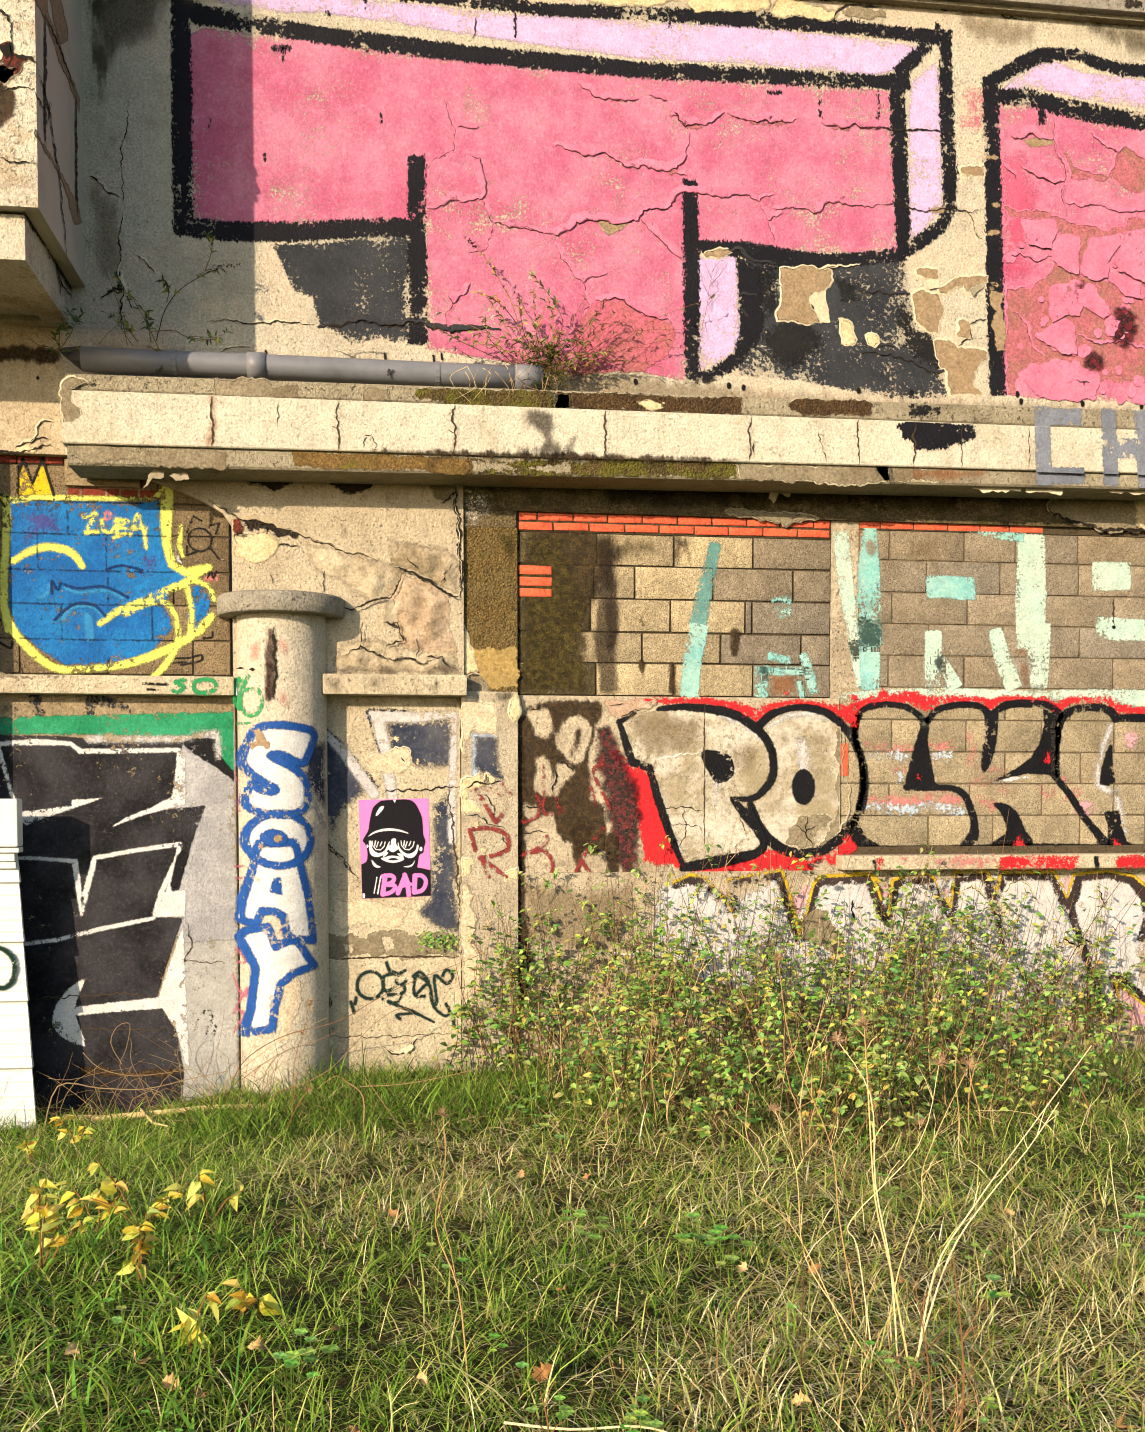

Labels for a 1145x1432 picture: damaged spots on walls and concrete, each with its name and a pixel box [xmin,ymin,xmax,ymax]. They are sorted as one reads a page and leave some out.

peeling [34,0,80,112]
spalling [1124,0,1144,10]
peeling [34,129,83,225]
crack [0,9,156,330]
peeling [414,79,887,417]
peeling [702,118,1145,405]
spalling [232,518,298,564]
crack [208,487,464,669]